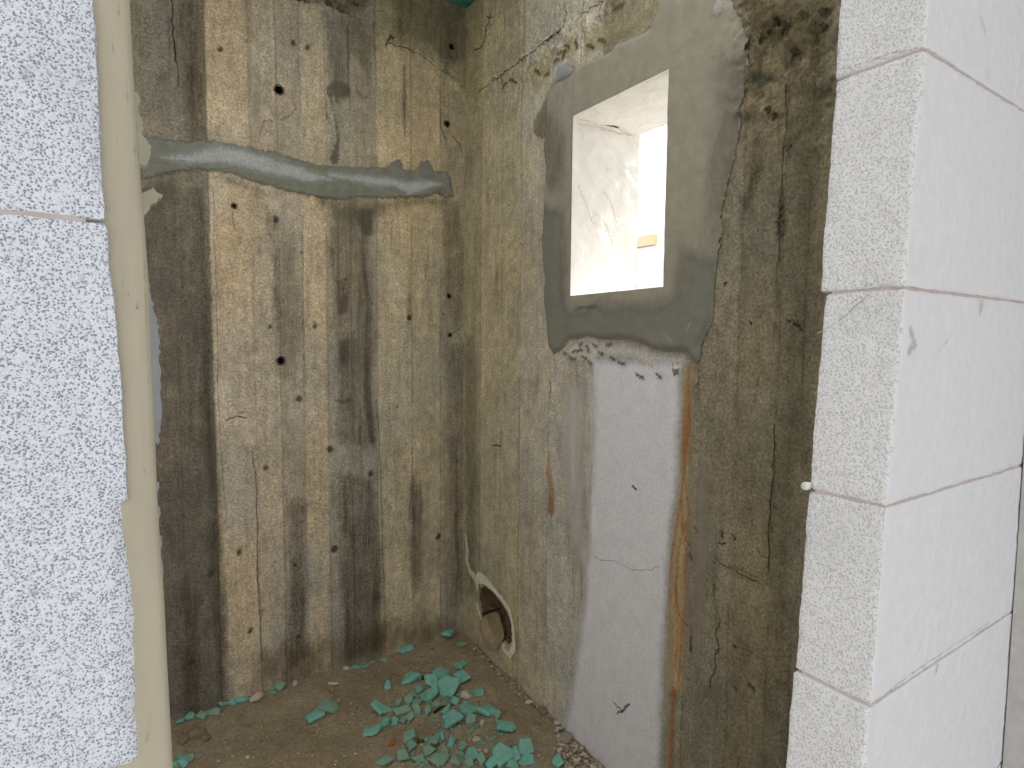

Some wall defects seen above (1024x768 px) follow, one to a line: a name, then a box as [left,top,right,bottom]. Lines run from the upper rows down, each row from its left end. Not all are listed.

crack [466,12,492,51]
crack [478,0,604,92]
leakage [337,206,385,436]
leakage [542,206,717,768]
rust [669,374,690,768]
crack [768,425,777,571]